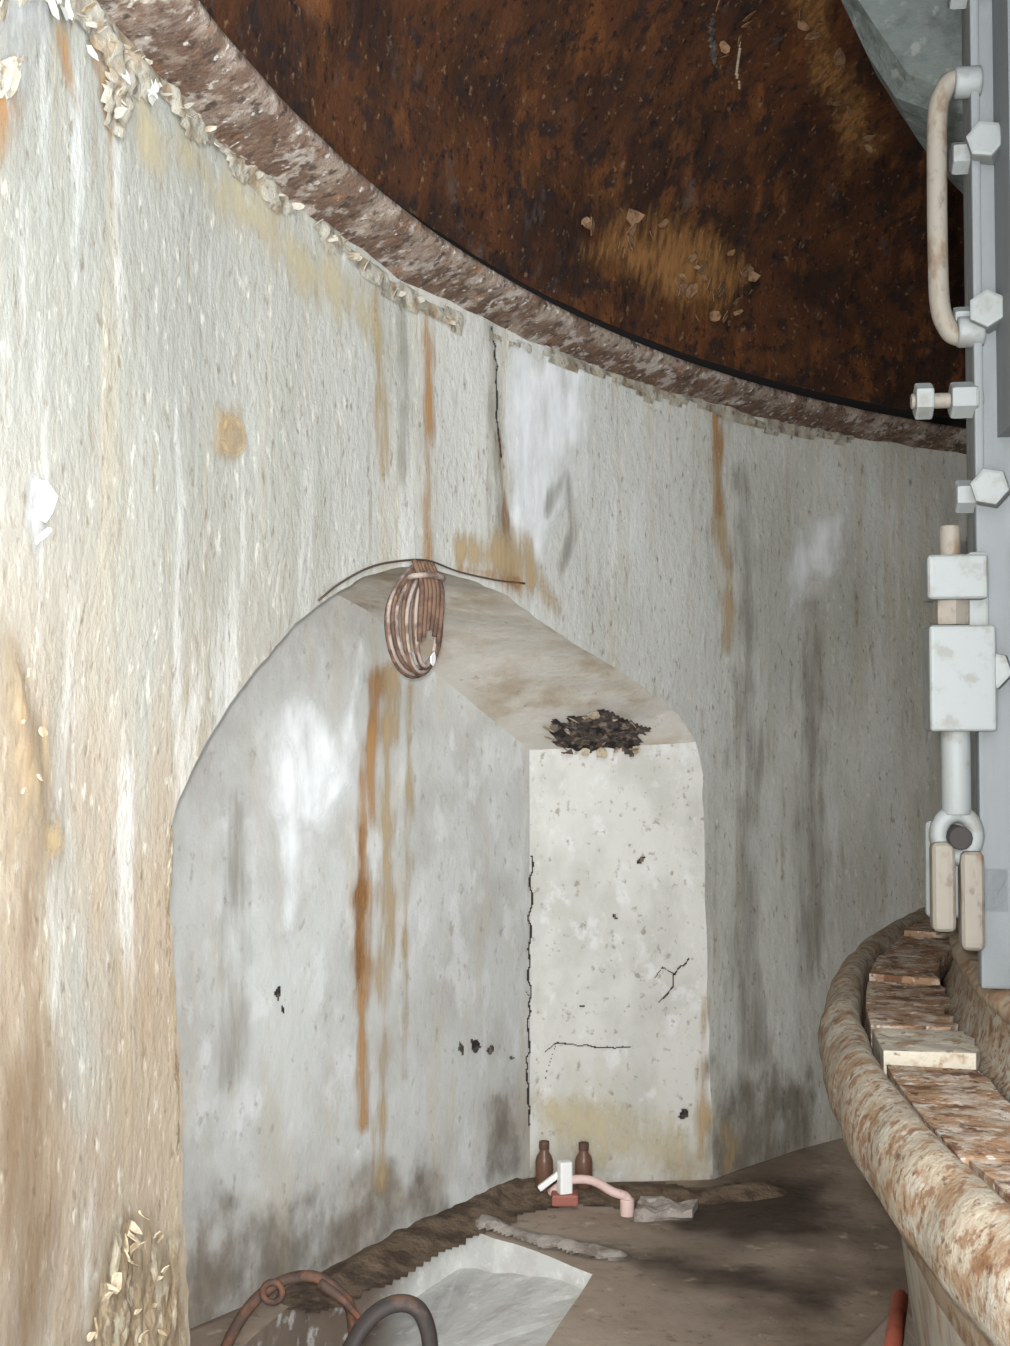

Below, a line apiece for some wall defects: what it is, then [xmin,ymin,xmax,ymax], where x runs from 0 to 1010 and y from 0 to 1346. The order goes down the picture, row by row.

spalling [0,0,305,217]
rust [708,0,756,89]
spalling [314,219,464,336]
rust [425,326,433,435]
rust [713,414,732,646]
rust [355,665,411,1134]
spalling [87,1210,186,1346]